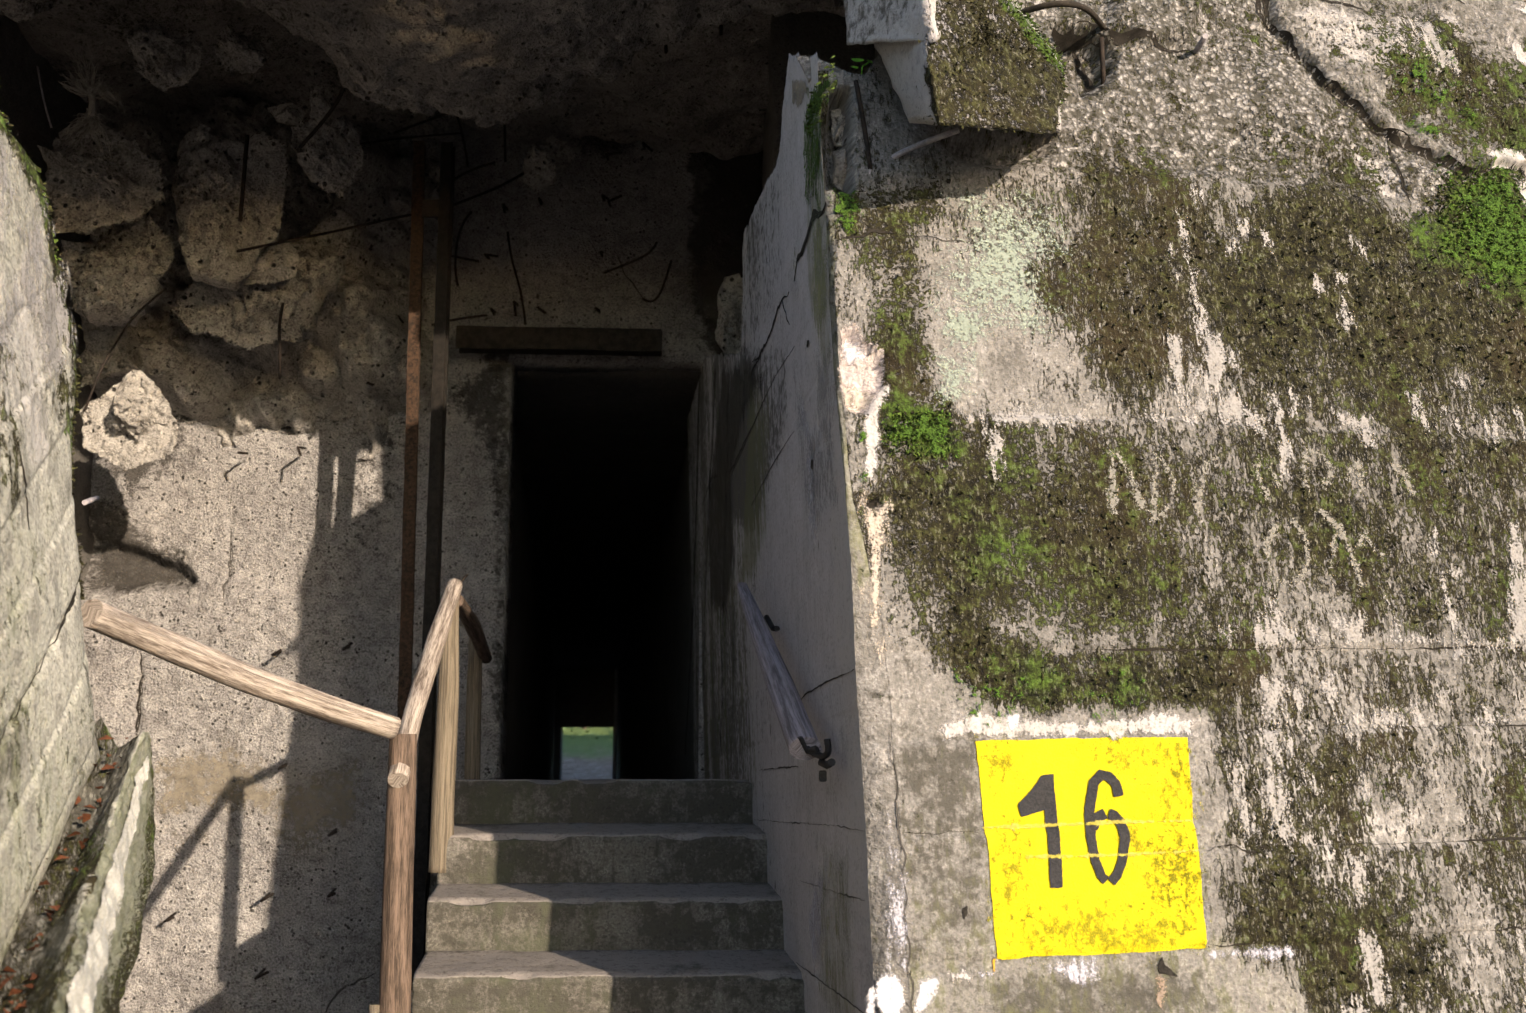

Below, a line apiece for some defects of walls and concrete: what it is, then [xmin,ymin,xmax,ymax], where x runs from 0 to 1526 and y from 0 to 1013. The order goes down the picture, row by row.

crack [1051,20,1185,91]
crack [1256,0,1526,202]
spalling [238,135,249,222]
spalling [236,214,411,253]
damp [1126,184,1311,480]
damp [961,404,1089,479]
damp [1218,594,1368,652]
damp [1383,522,1526,664]
damp [939,711,1194,741]
damp [1225,671,1429,845]
damp [866,879,990,1013]
damp [1341,929,1392,1013]